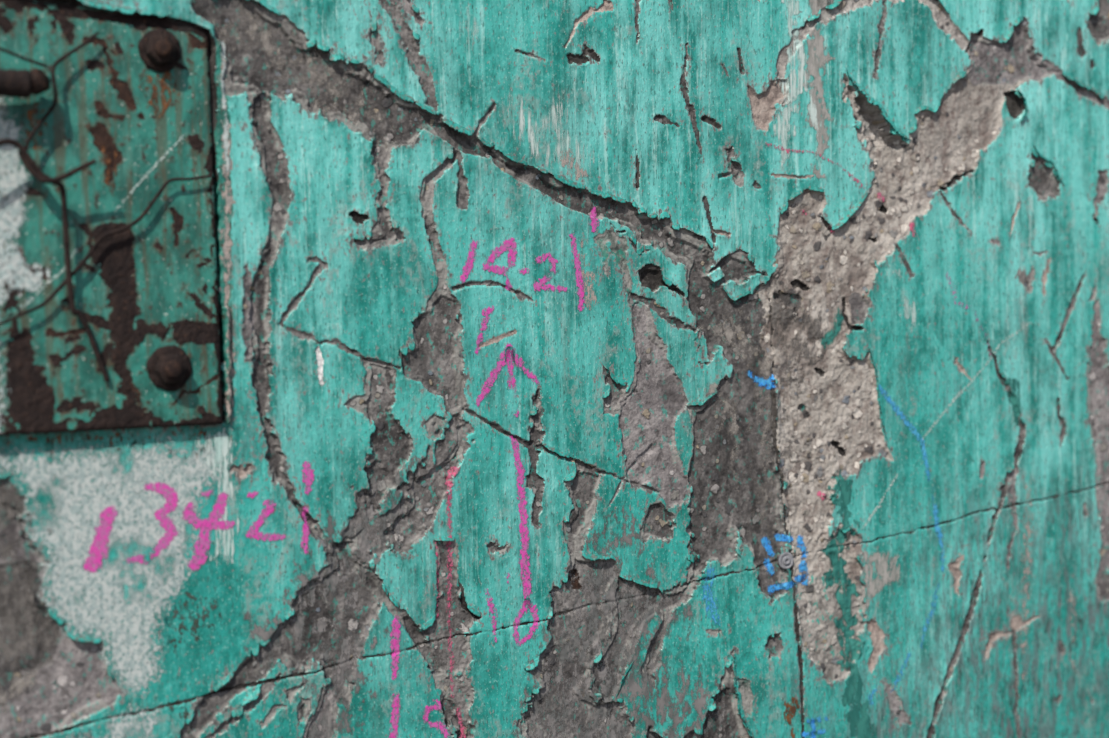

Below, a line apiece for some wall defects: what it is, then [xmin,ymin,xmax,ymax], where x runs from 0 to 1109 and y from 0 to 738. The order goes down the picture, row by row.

corrosion [0,0,209,194]
corrosion [0,133,232,459]
peeling [0,428,254,738]
crack [25,90,482,738]
crack [379,0,443,120]
peeling [165,0,714,738]
crack [462,408,659,505]
spalling [516,0,1053,738]
crack [496,292,1109,738]
crack [776,0,984,79]
peeling [1028,145,1065,200]
peeling [1083,286,1109,602]